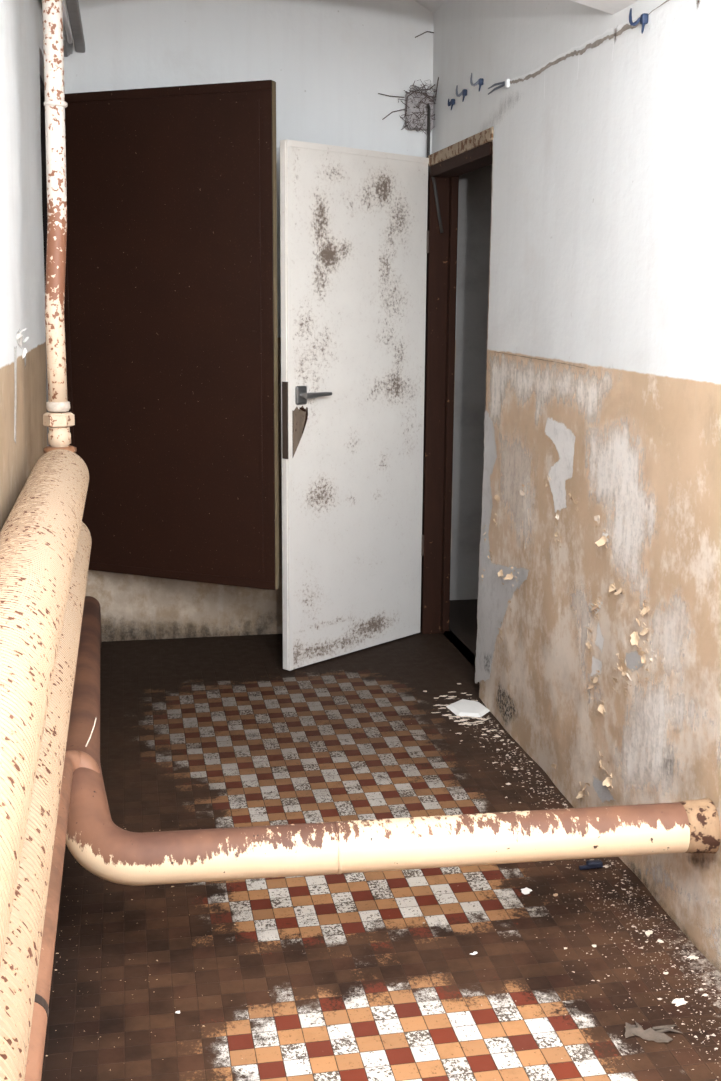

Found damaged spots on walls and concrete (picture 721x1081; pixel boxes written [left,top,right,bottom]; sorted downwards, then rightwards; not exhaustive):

peeling [475,359,529,683]
peeling [544,417,579,548]
peeling [594,515,609,549]
peeling [584,574,652,716]
peeling [576,751,615,803]